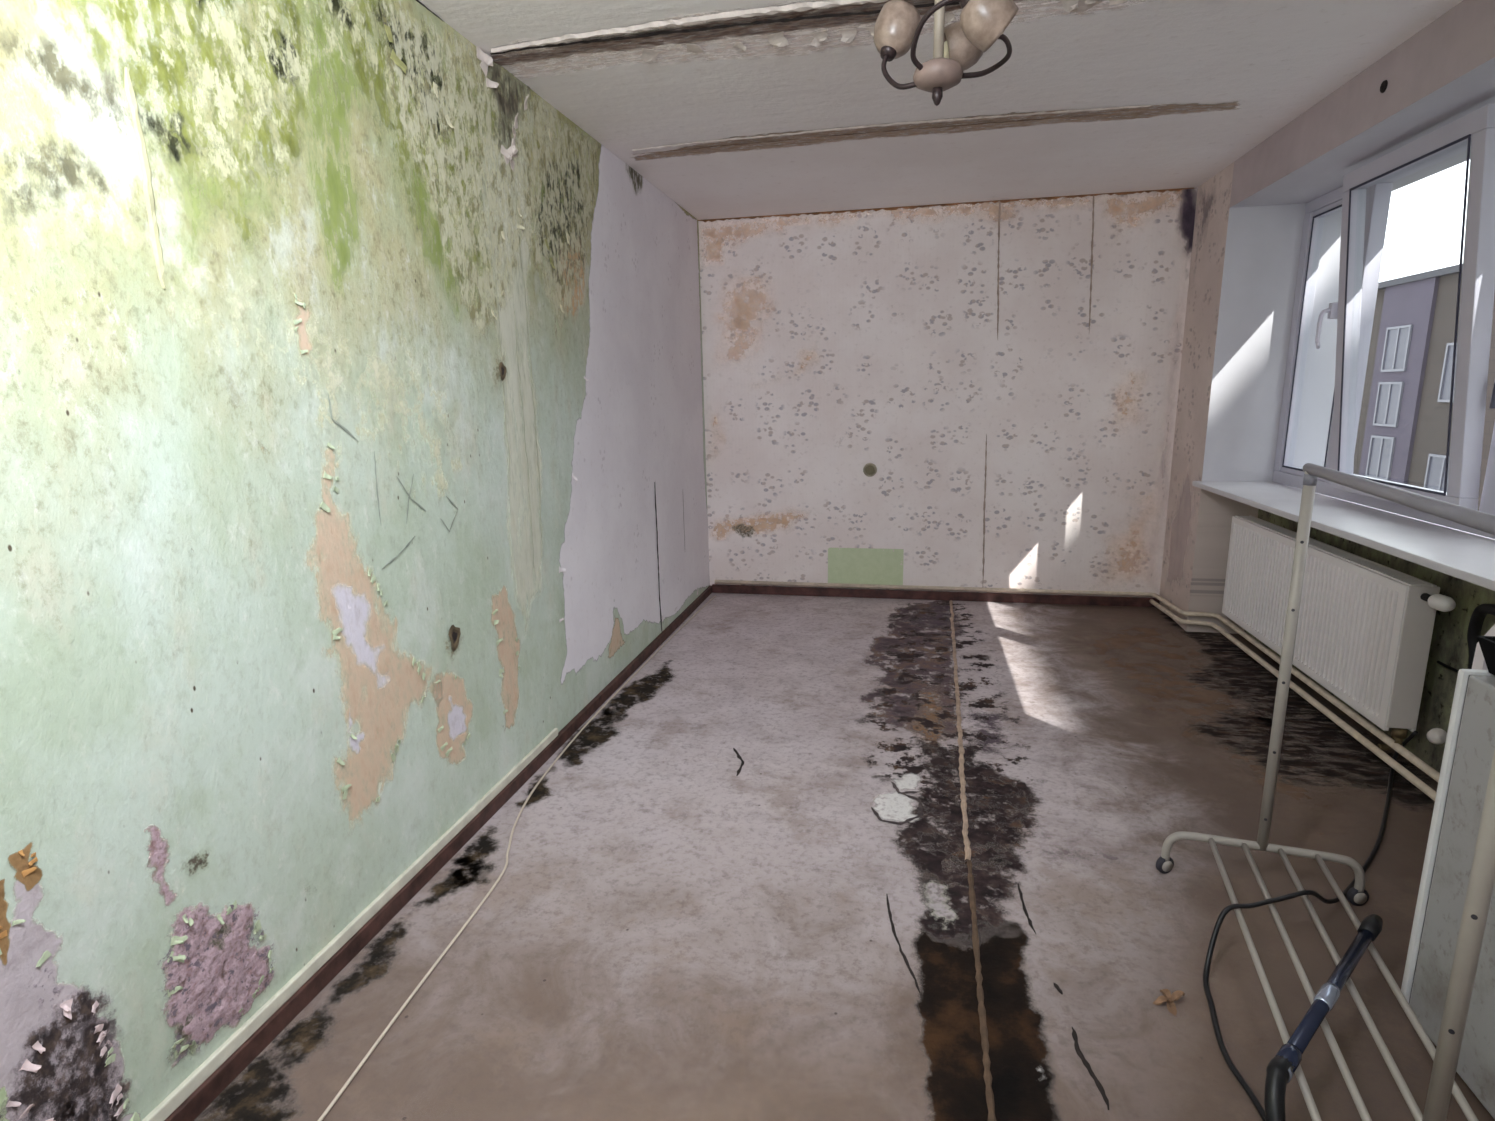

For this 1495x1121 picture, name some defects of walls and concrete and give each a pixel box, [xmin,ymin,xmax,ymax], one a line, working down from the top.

water stain [0,33,217,258]
water stain [267,0,359,288]
water stain [374,0,452,138]
crack [490,0,962,78]
crack [633,102,1239,161]
crack [1013,0,1141,19]
peeling [308,442,473,820]
peeling [491,586,520,728]
water stain [860,600,1061,1121]
water stain [0,970,131,1121]
peeling [0,842,141,1121]
spalling [162,900,274,1067]